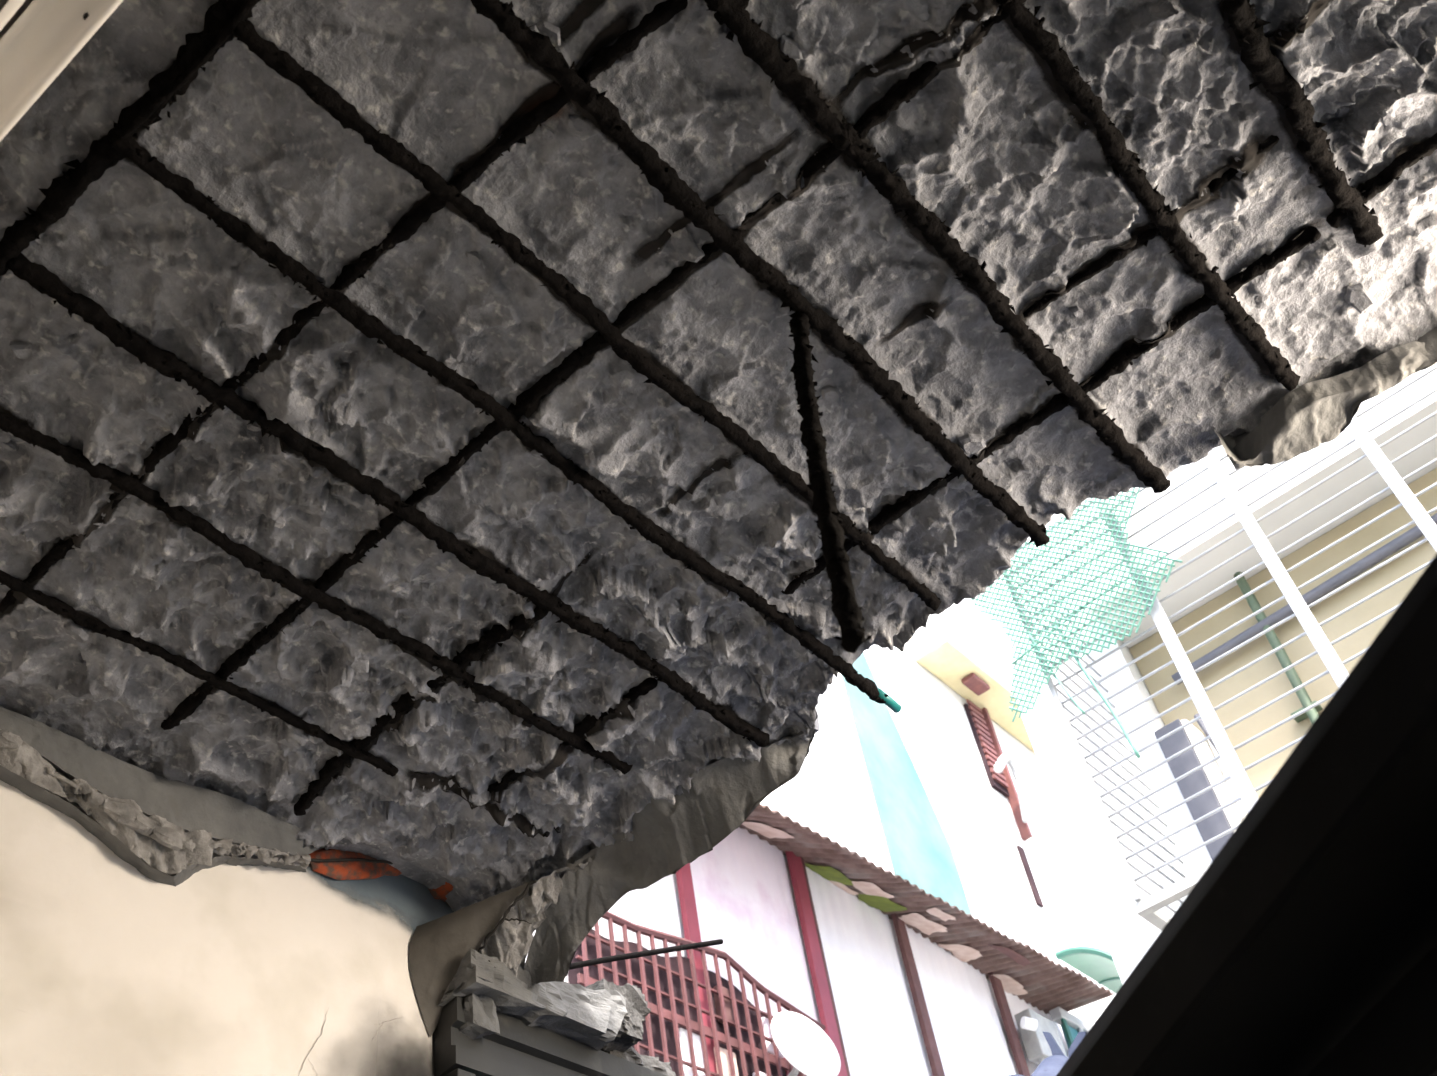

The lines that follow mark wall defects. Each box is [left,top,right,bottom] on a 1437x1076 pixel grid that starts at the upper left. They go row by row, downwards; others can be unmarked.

spalling [0,0,1029,1037]
spalling [245,0,1437,611]
water stain [401,1053,433,1076]